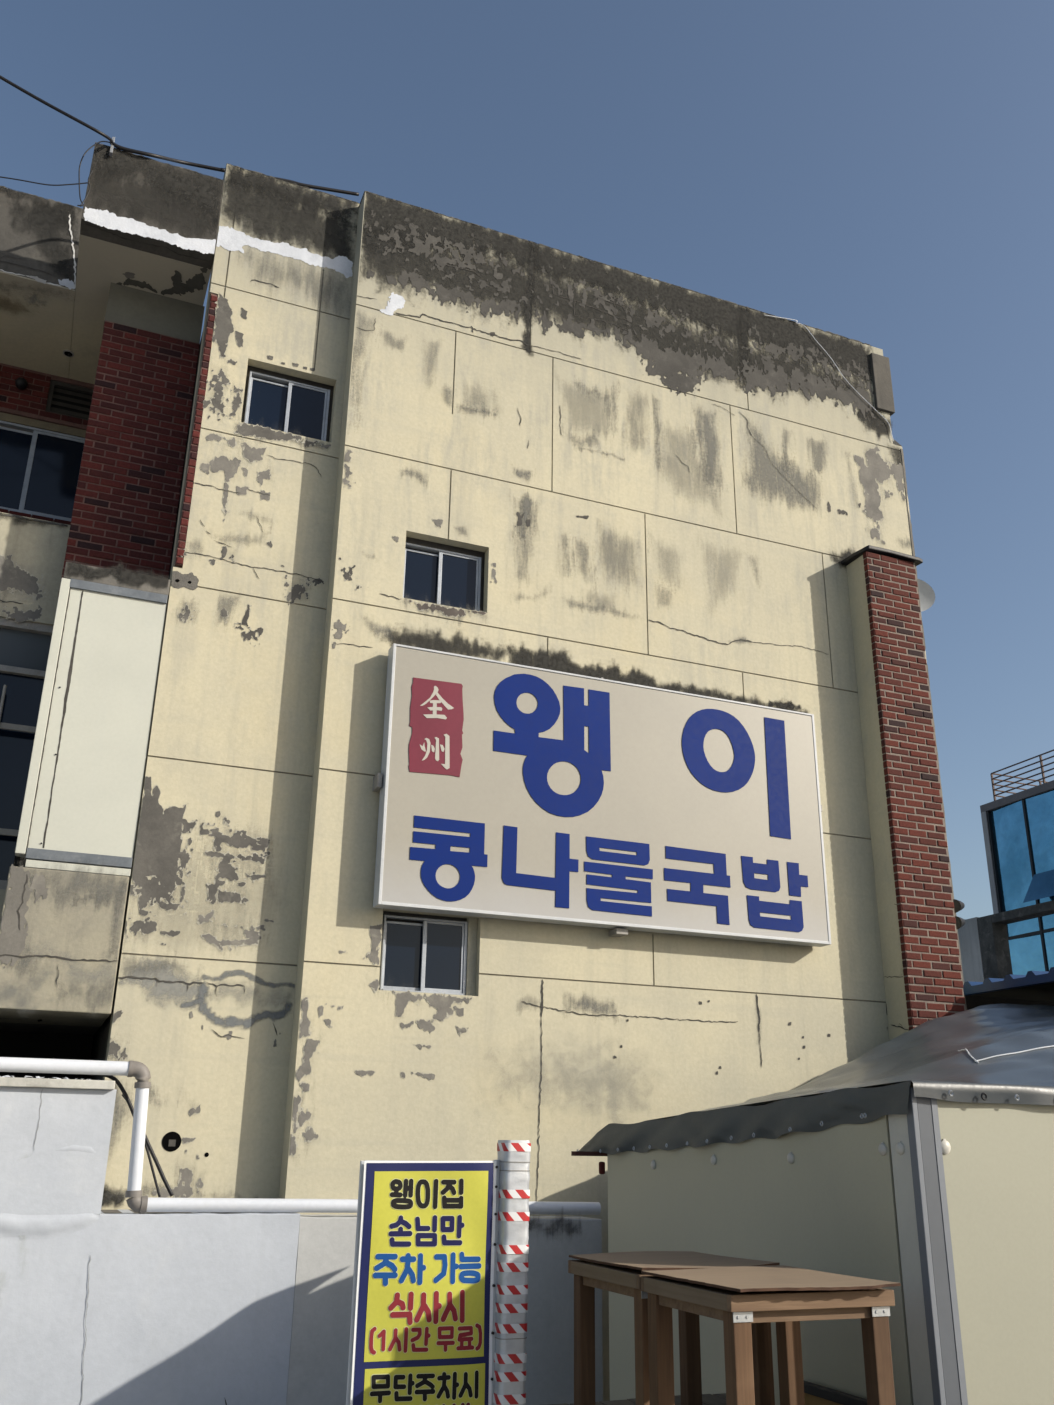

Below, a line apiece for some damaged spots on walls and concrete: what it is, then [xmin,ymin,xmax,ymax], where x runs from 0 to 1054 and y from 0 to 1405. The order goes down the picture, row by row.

water stain [0,186,75,280]
water stain [91,143,902,465]
peeling [84,223,356,522]
water stain [697,411,718,482]
water stain [746,430,823,508]
peeling [0,554,46,626]
peeling [281,565,325,605]
peeling [339,557,362,591]
water stain [332,619,808,713]
crack [650,620,826,654]
peeling [125,776,274,952]
peeling [339,924,472,1050]